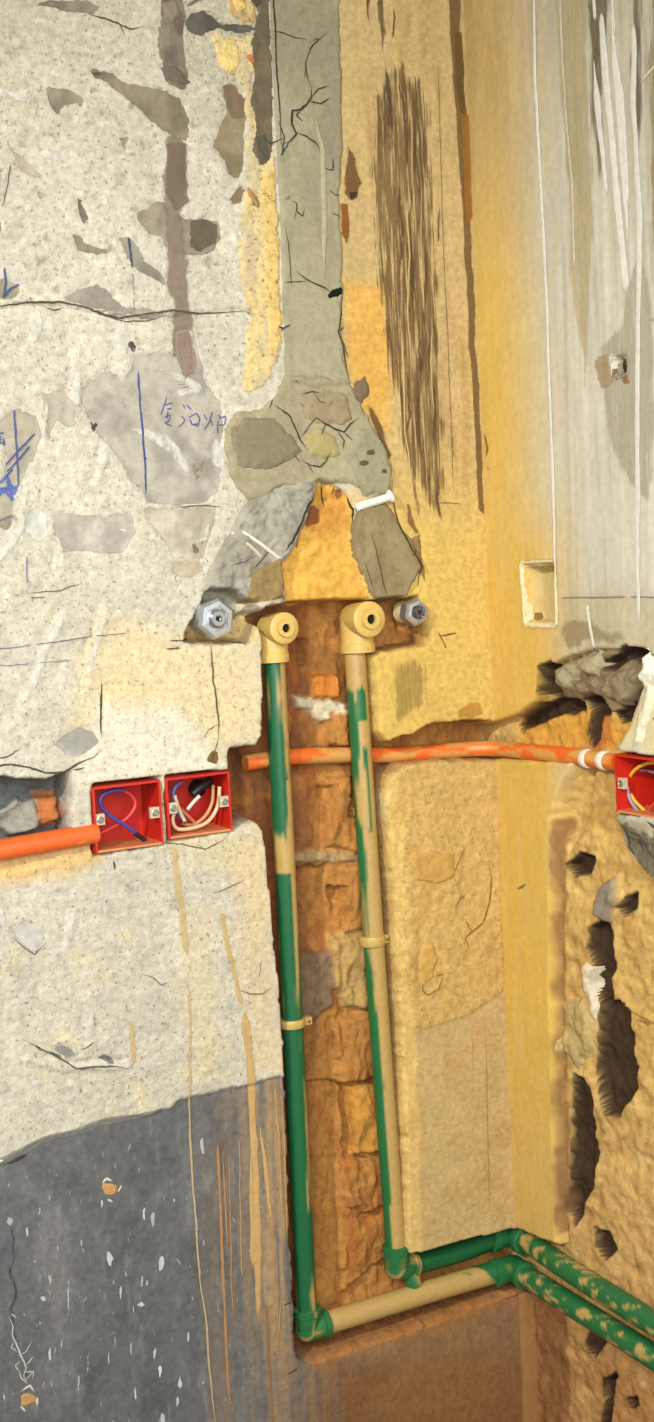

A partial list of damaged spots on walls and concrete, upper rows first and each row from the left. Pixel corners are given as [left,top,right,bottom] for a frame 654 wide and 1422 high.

flaking render [38,0,99,14]
flaking render [46,87,83,114]
flaking render [91,69,189,140]
flaking render [73,199,221,285]
flaking render [64,284,165,319]
crack [0,301,290,331]
crack [231,0,422,599]
peeling [372,64,444,517]
water stain [369,407,391,458]
flaking render [0,330,654,1347]
water stain [188,914,287,1422]
spalling [527,1292,654,1422]